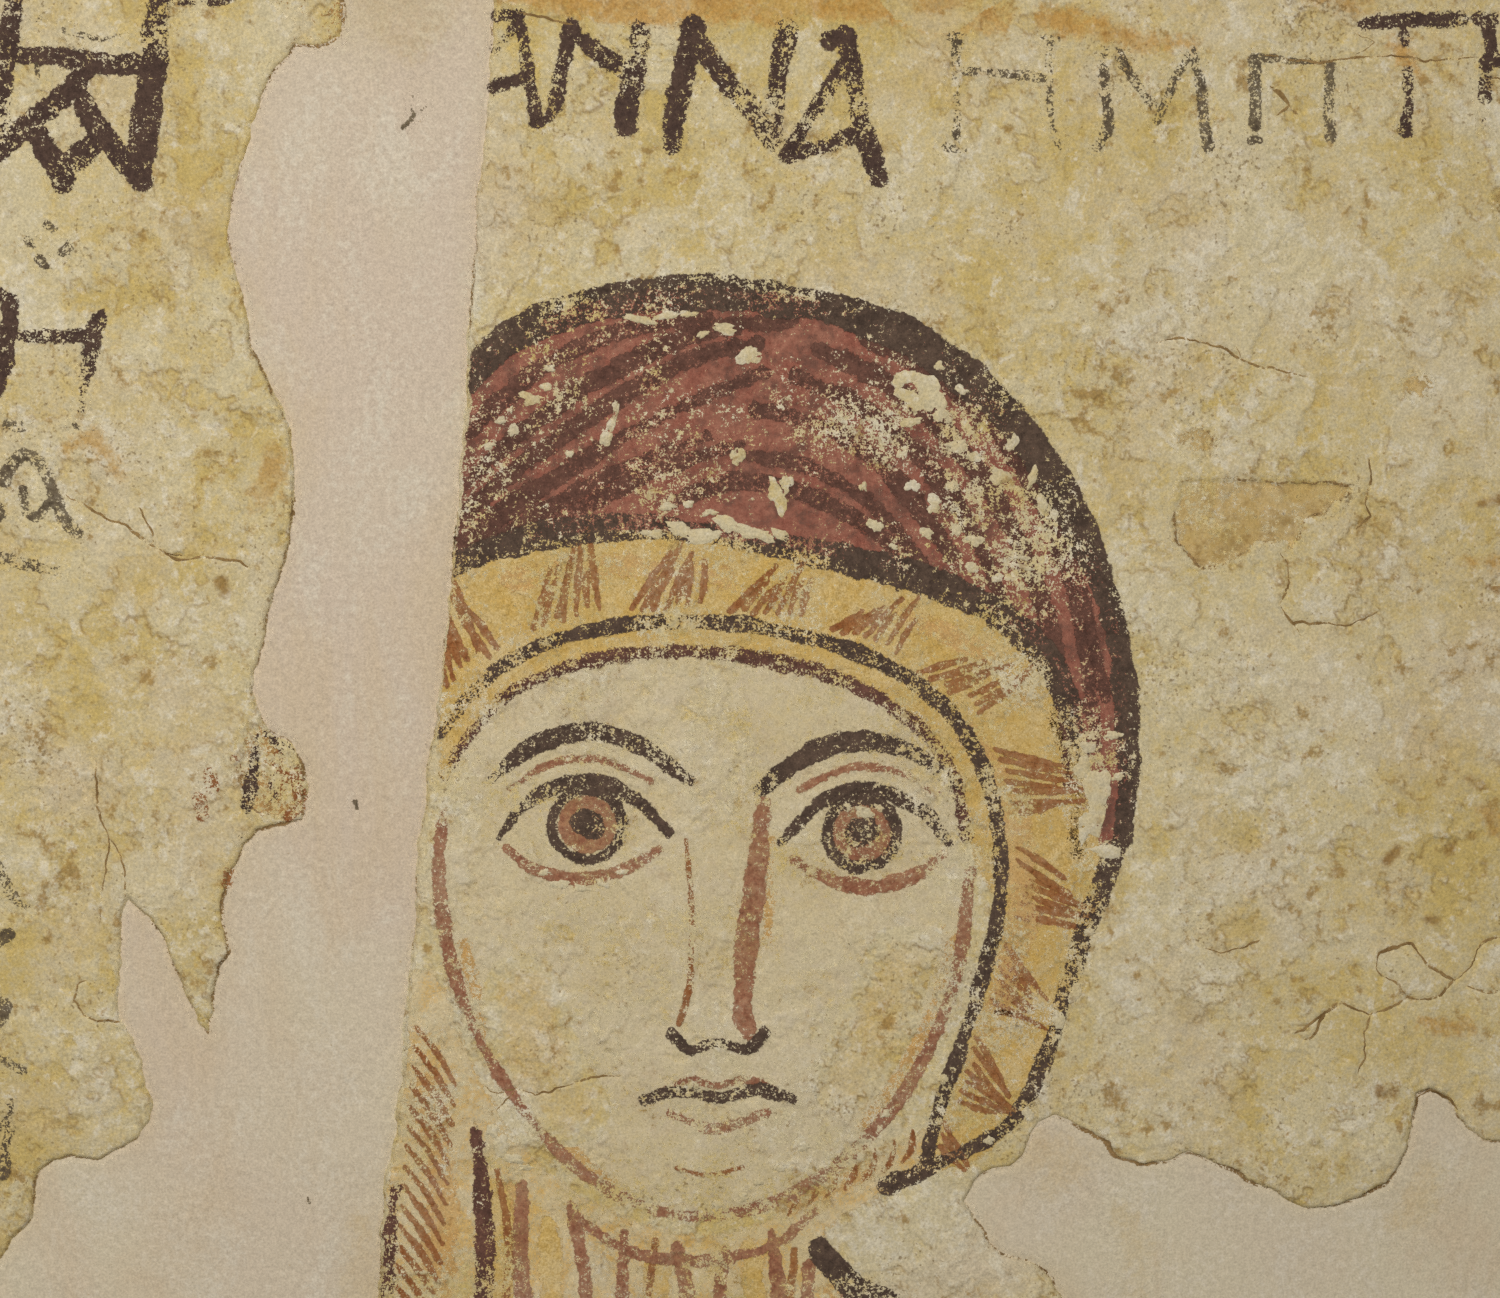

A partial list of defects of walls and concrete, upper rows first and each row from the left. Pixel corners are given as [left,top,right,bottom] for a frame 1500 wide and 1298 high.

peeling [622,310,762,365]
peeling [483,364,555,450]
peeling [599,400,619,446]
peeling [893,360,969,427]
peeling [639,475,794,545]
peeling [904,479,1035,582]
peeling [944,439,1059,521]
crack [1356,459,1372,529]
crack [1280,553,1378,636]
spalling [0,0,494,1298]
crack [1295,937,1498,1072]
spalling [964,1089,1500,1298]